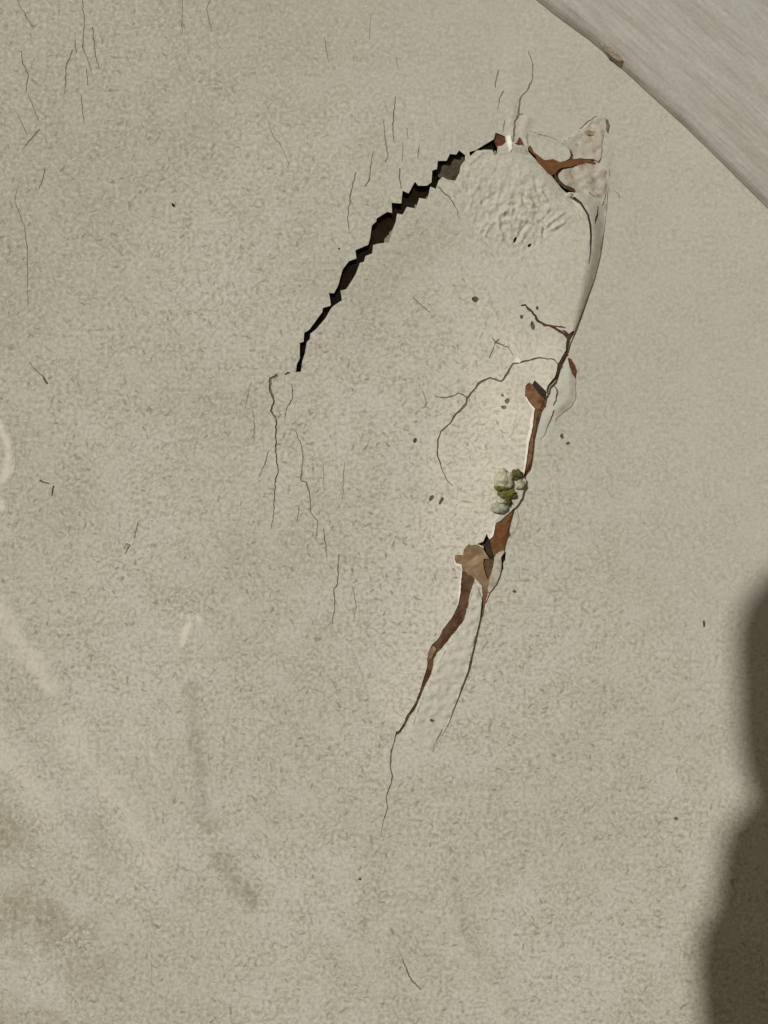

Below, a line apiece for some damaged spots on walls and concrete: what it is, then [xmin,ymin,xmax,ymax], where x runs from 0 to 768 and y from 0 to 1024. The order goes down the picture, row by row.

crack [245,51,610,624]
flaking render [506,117,609,205]
crack [554,170,620,260]
flaking render [411,357,577,752]
crack [381,571,488,835]